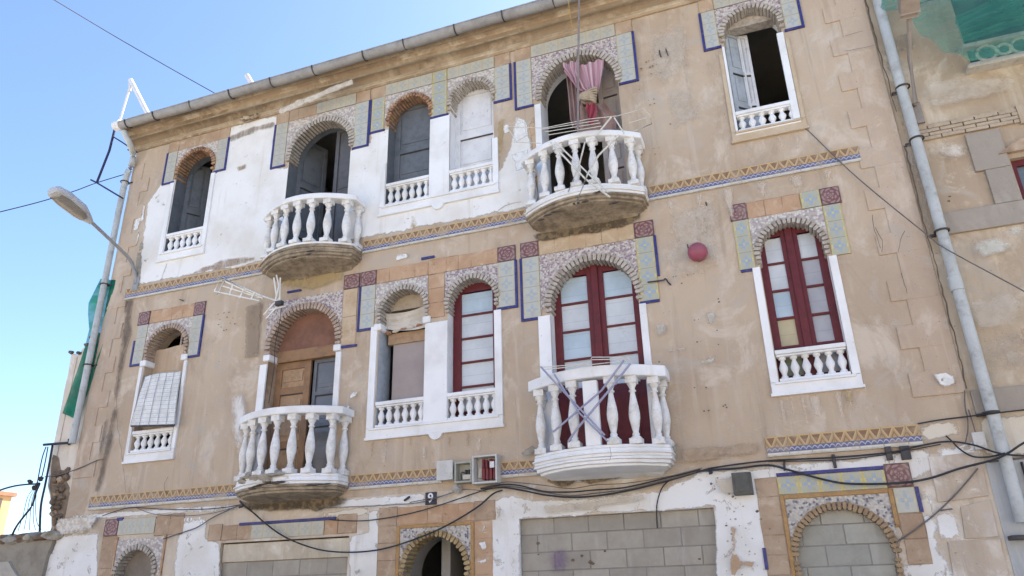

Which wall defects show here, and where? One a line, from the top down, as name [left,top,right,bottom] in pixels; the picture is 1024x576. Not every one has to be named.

peeling [503,119,536,171]
water stain [115,300,132,393]
water stain [96,409,115,490]
spalling [49,467,96,534]
peeling [710,477,762,575]